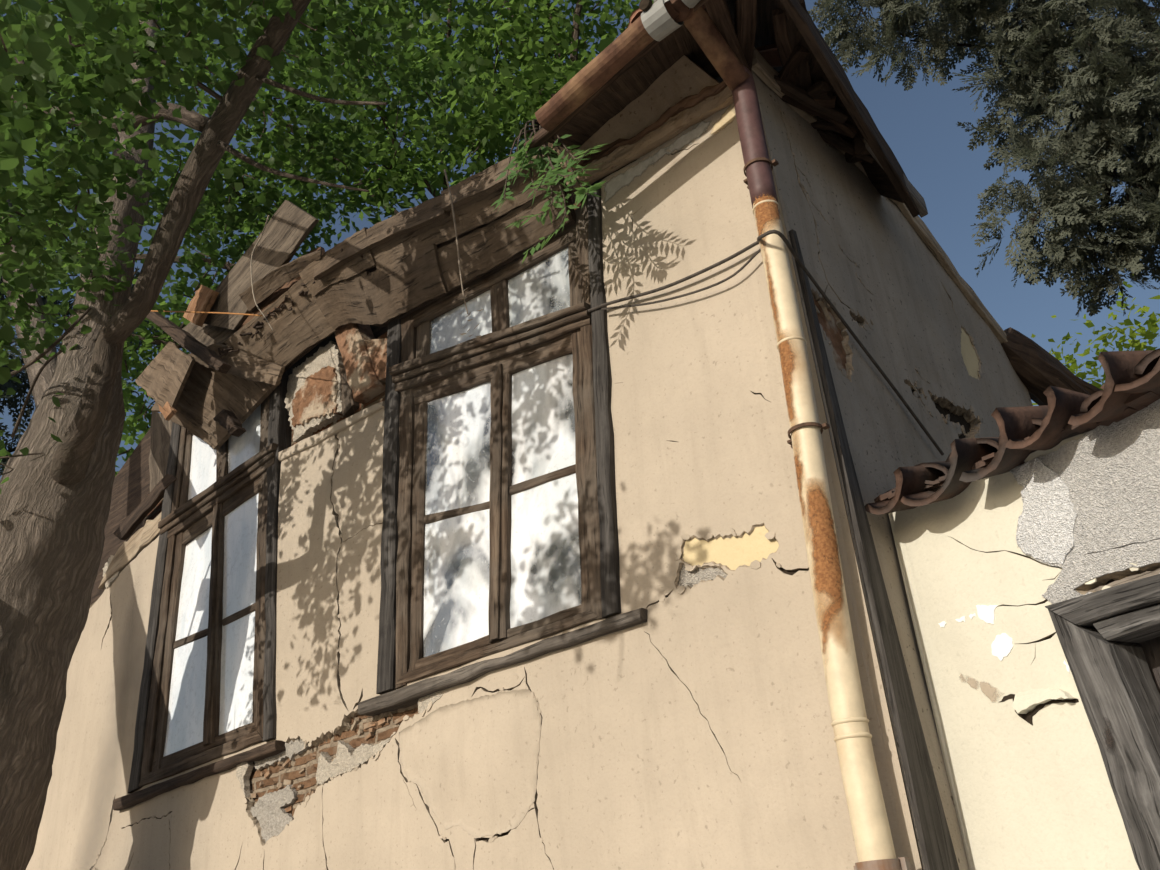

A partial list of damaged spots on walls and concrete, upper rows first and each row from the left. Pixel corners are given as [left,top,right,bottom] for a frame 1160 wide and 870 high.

rust [767,264,794,420]
spalling [904,379,983,439]
crack [330,409,383,712]
peeling [674,523,779,594]
rust [794,456,842,650]
crack [948,536,1061,607]
peeling [1010,458,1078,564]
crack [472,667,543,725]
crack [645,590,740,779]
crack [1019,632,1056,663]
spalling [236,691,443,846]
crack [395,738,554,870]